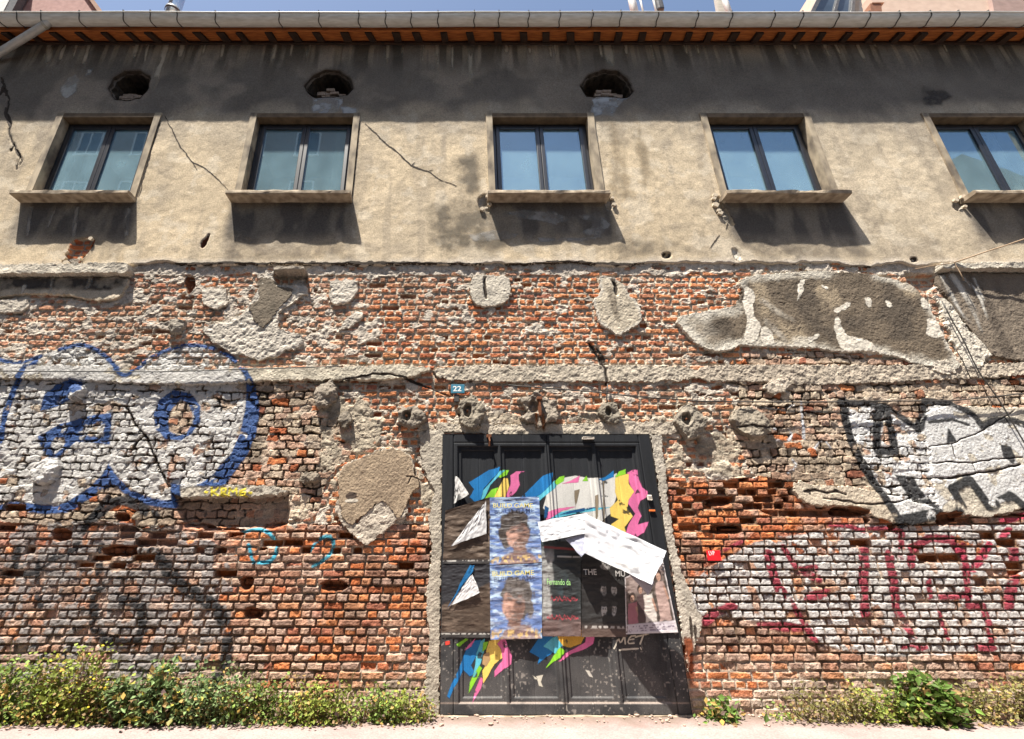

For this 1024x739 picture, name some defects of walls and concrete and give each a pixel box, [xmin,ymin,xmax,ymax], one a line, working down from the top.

hole [305,70,353,98]
efflorescence [313,99,356,113]
hole [580,70,633,99]
damp [592,97,627,116]
crack [138,116,228,197]
crack [352,123,456,198]
peeling [742,287,774,346]
peeling [834,302,879,356]
peeling [921,298,945,338]
crack [341,372,450,397]
crack [588,343,608,386]
crack [804,411,1021,505]